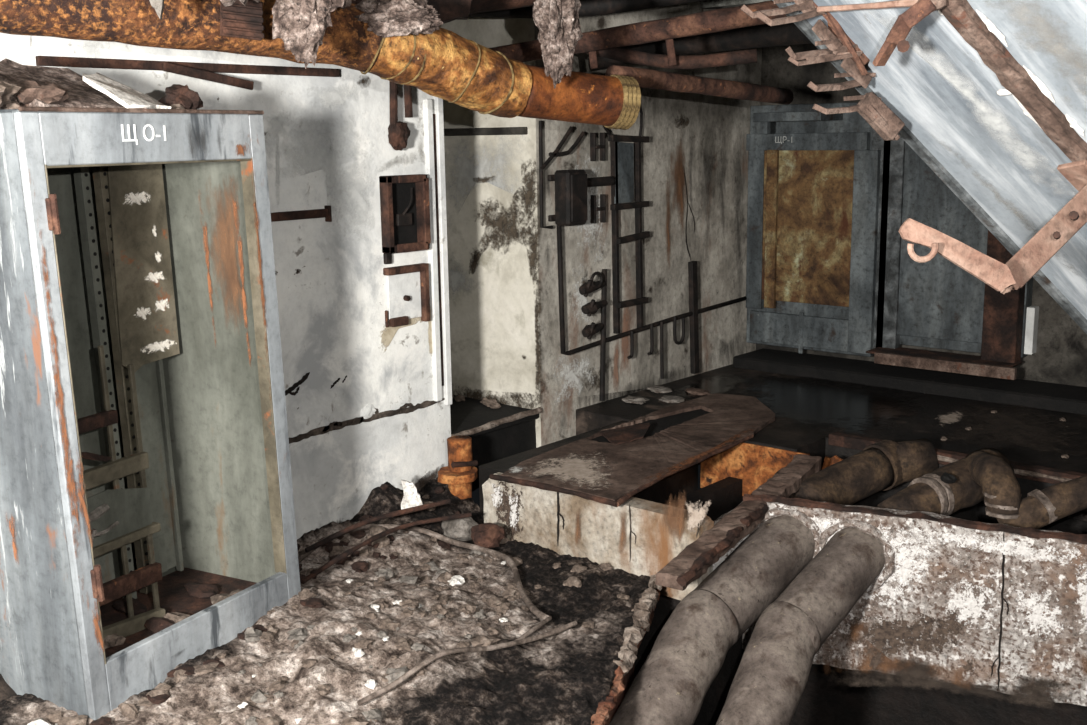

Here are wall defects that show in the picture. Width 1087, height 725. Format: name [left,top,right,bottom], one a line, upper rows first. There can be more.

leakage [455,151,504,196]
rust [666,151,685,261]
leakage [448,162,593,420]
crack [289,398,445,444]
leakage [713,534,749,571]
leakage [813,518,840,544]
leakage [865,525,1087,629]
leakage [1015,590,1063,639]
leakage [839,662,1065,708]